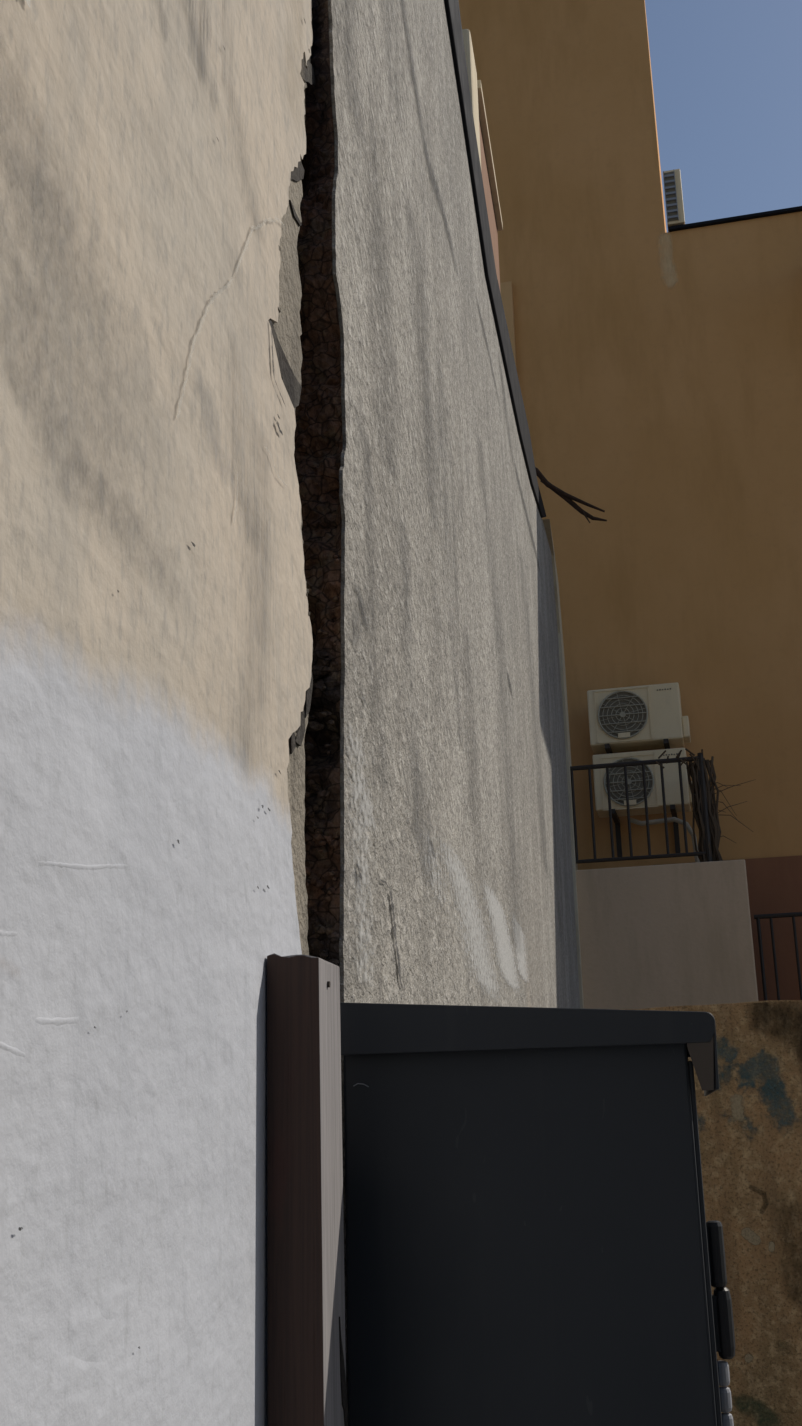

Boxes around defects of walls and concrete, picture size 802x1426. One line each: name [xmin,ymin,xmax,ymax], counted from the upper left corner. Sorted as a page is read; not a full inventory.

crack [177,0,402,987]